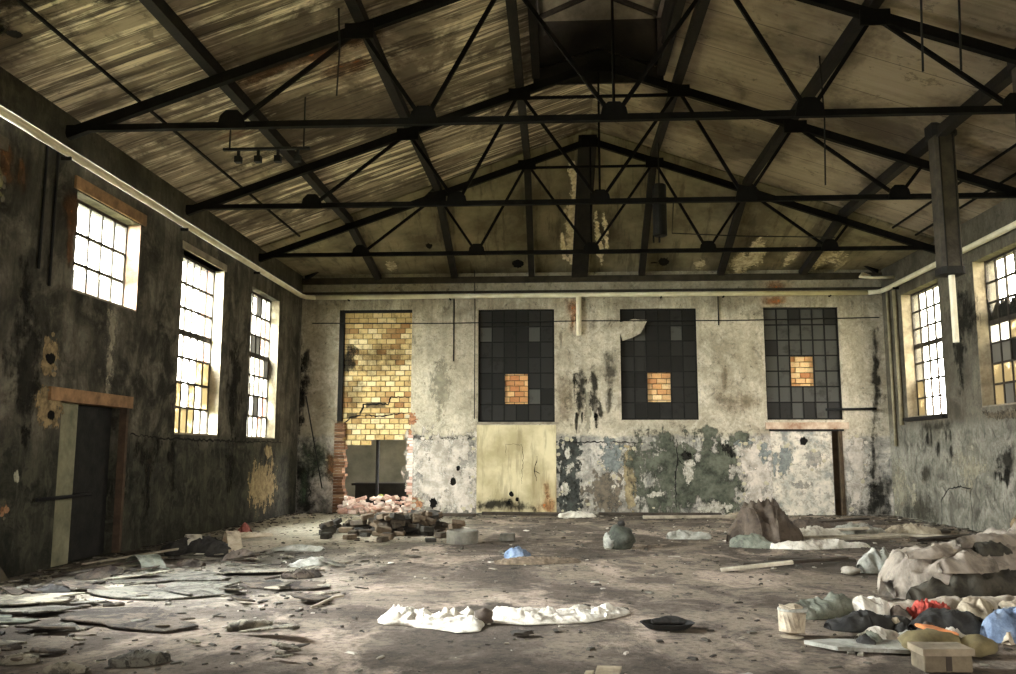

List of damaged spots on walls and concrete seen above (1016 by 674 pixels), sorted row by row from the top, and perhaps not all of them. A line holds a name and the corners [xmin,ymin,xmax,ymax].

crack [344,396,410,423]
leakage [573,353,617,431]
leakage [922,422,952,457]
peeling [556,424,826,514]
leakage [994,469,1010,488]
leakage [905,491,938,522]